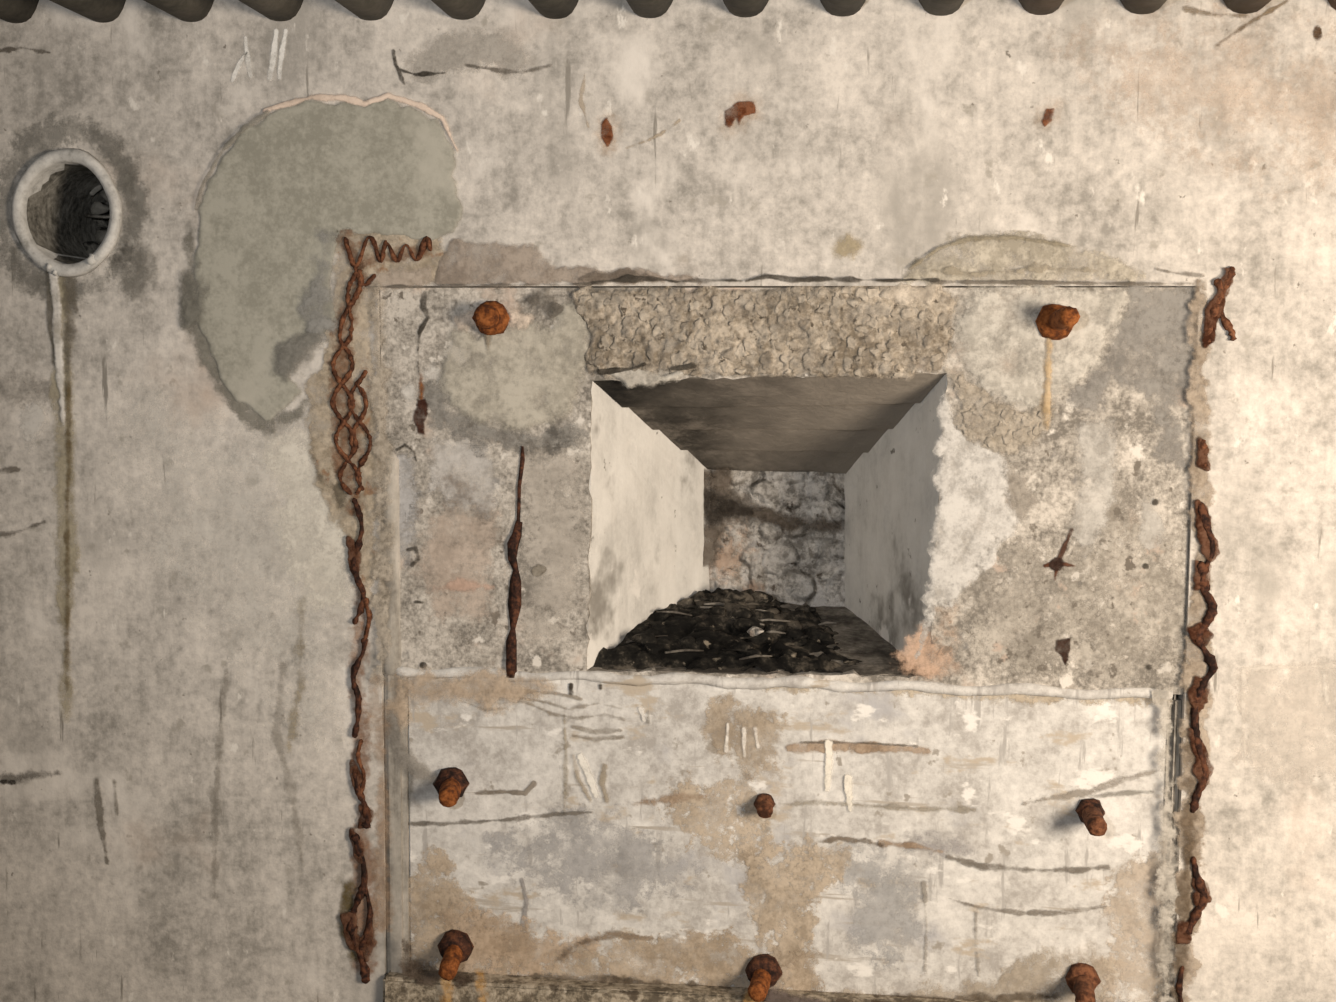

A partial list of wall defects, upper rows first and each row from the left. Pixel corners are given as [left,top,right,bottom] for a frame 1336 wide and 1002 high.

corrosion [601,118,613,147]
corrosion [725,101,756,127]
leakage [0,117,152,713]
leakage [156,431,349,748]
corrosion [414,382,428,434]
spalling [305,231,957,728]
spalling [892,279,1214,1002]
corrosion [1196,437,1211,471]
corrosion [1193,499,1220,591]
corrosion [1202,268,1236,348]
corrosion [340,657,376,972]
peeling [409,695,930,992]